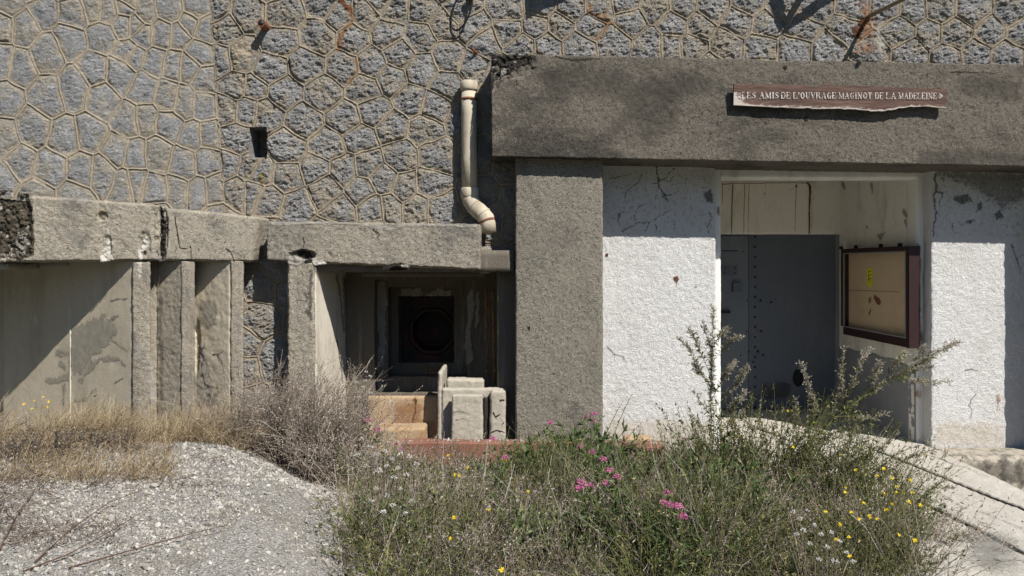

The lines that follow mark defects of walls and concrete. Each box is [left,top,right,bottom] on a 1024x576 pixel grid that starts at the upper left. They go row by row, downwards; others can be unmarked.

corrosion [852,20,864,40]
spalling [490,54,533,89]
spalling [0,190,35,261]
spalling [288,248,326,320]
damp [45,313,156,404]